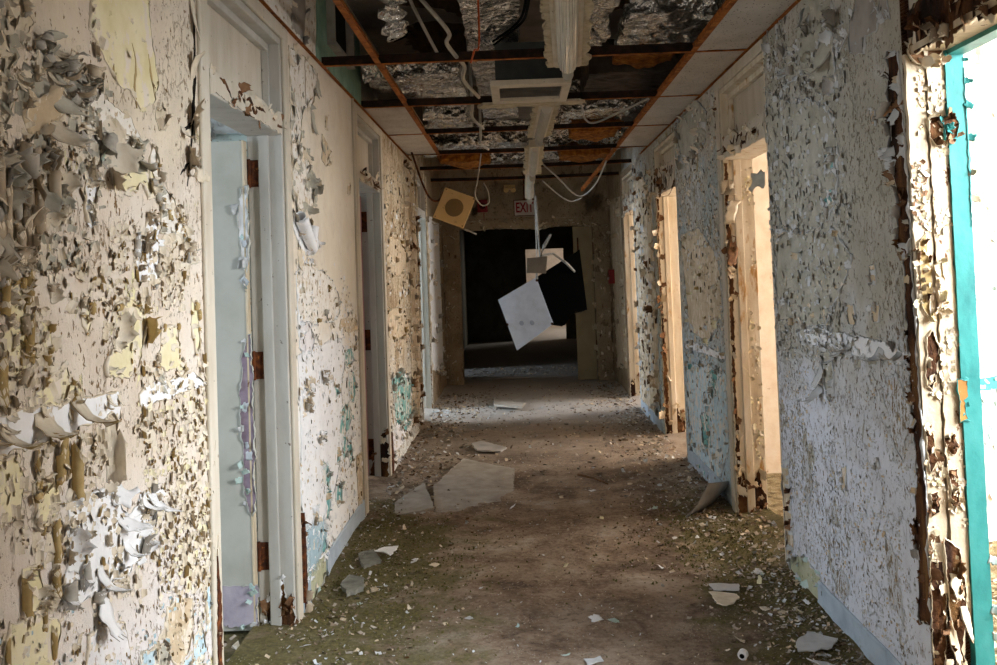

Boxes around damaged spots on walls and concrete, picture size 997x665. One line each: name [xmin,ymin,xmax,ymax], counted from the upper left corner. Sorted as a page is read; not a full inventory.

peeling [0,0,299,665]
crack [180,0,210,186]
peeling [209,0,448,602]
peeling [464,215,597,232]
peeling [606,0,997,665]